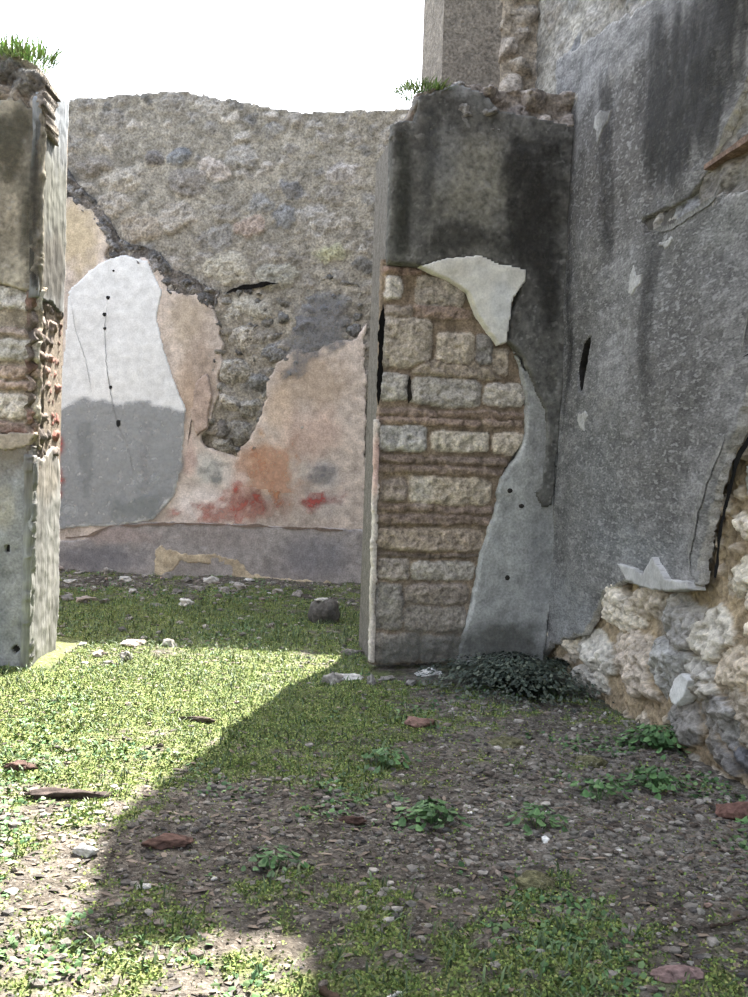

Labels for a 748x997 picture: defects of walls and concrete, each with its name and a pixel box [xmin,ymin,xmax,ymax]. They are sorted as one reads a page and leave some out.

water stain [643,0,743,185]
spalling [0,285,47,451]
spalling [67,168,362,456]
water stain [432,142,569,323]
spalling [368,259,525,677]
spalling [154,545,331,583]
spalling [547,433,748,789]